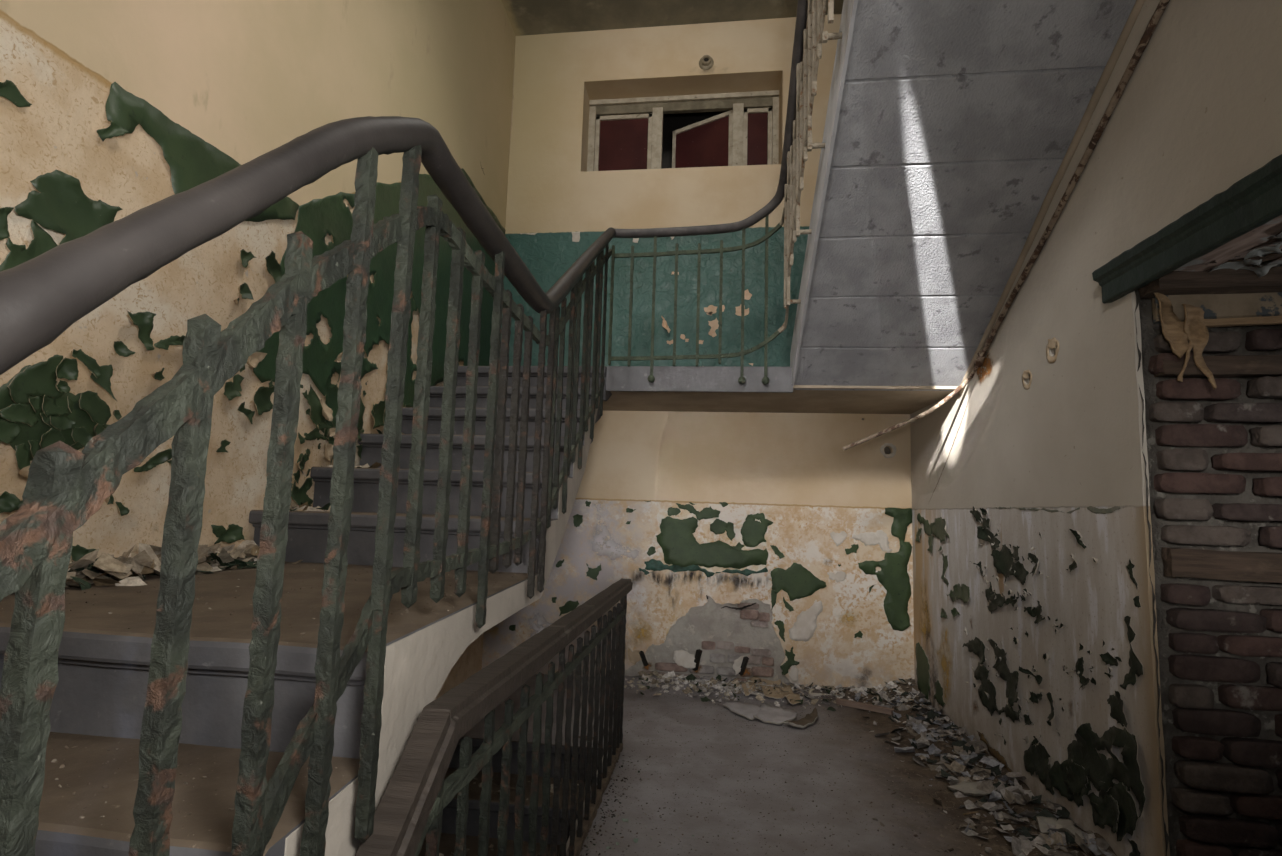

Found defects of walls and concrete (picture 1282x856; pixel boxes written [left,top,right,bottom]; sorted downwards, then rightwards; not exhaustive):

peeling [0,80,33,107]
peeling [96,82,241,194]
peeling [0,170,122,271]
peeling [234,248,287,304]
peeling [245,192,355,259]
peeling [403,174,495,407]
peeling [0,311,185,478]
peeling [223,331,279,424]
peeling [291,276,347,506]
peeling [356,242,397,459]
peeling [211,524,245,544]
flaking render [625,289,1282,856]